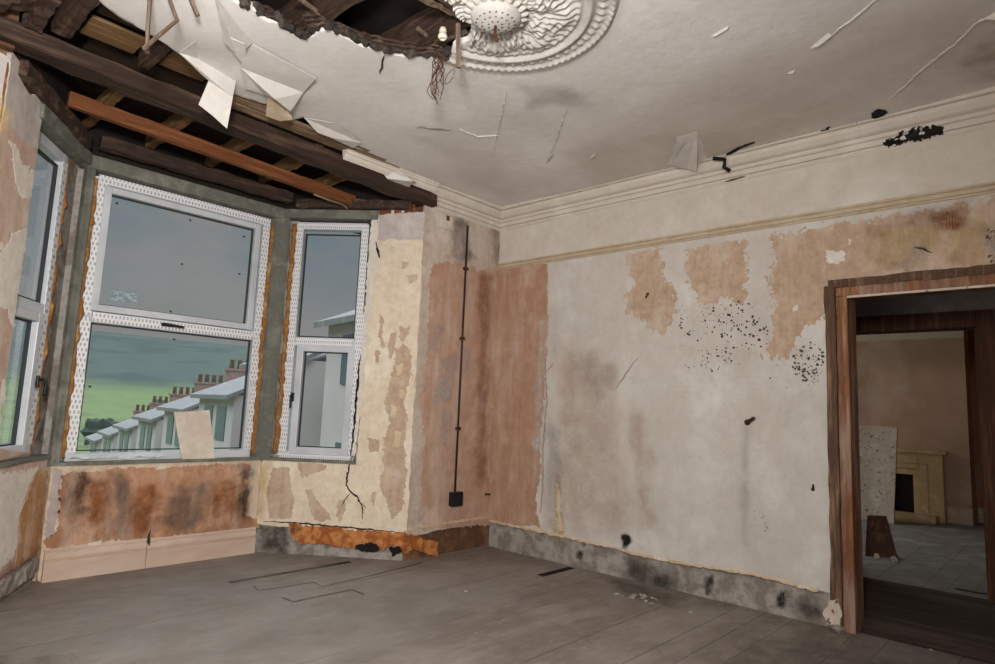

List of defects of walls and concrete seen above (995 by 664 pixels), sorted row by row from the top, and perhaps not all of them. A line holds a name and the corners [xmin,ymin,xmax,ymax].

spalling [239,0,452,61]
peeling [9,140,35,199]
peeling [0,228,28,328]
peeling [622,238,750,336]
peeling [759,194,995,361]
water stain [675,300,768,372]
water stain [792,342,825,385]
crack [264,355,403,533]
water stain [75,473,105,521]
peeling [0,463,260,599]
water stain [215,491,249,516]
peeling [266,462,346,523]